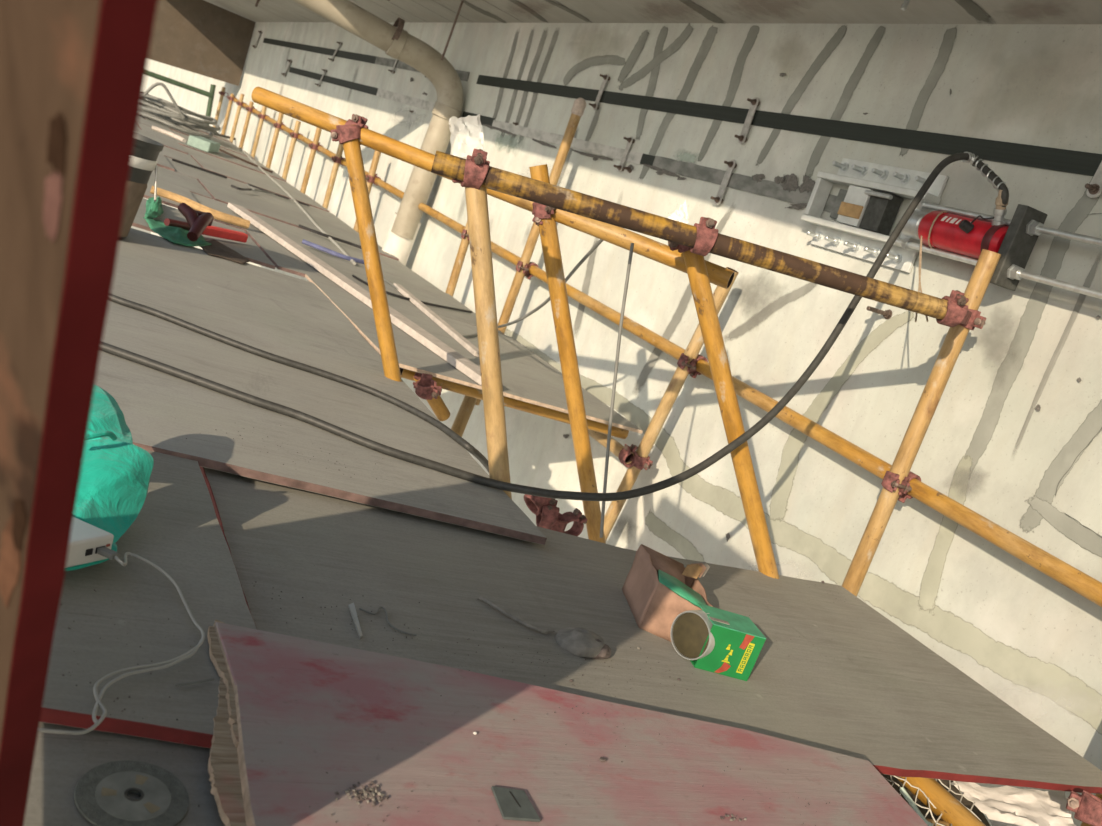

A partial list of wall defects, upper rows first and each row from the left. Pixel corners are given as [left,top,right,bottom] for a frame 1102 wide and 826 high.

crack [756,25,885,178]
crack [505,176,1102,734]